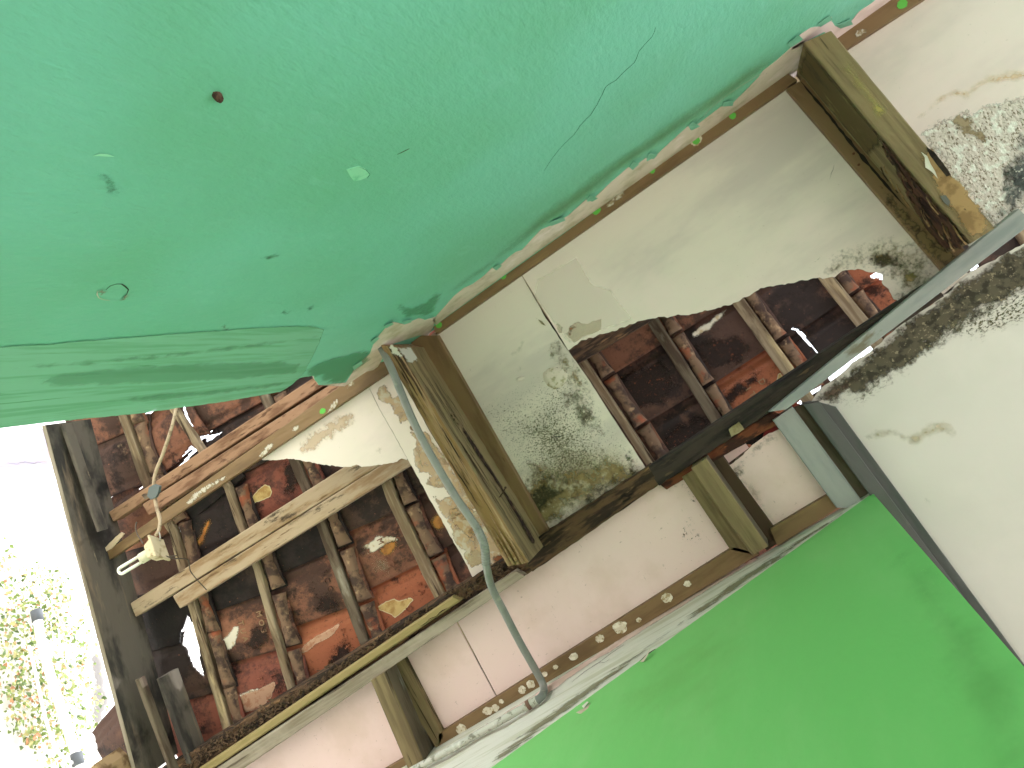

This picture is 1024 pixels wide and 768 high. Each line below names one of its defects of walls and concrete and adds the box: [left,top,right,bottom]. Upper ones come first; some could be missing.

peeling [327,0,890,386]
damp [1003,155,1024,212]
crack [524,280,567,349]
damp [818,246,1024,403]
damp [485,346,637,522]
peeling [503,558,758,715]